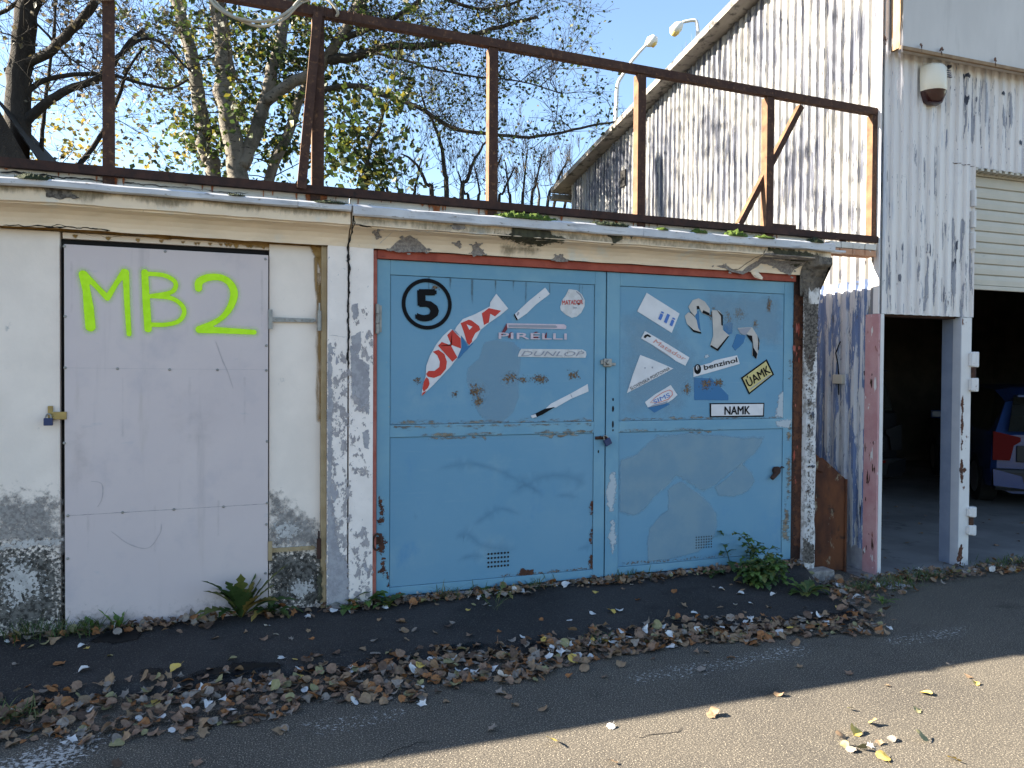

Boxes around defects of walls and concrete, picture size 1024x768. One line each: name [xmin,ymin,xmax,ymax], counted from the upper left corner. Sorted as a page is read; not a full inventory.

spalling [372,229,432,255]
crack [333,216,496,366]
spalling [712,253,816,280]
peeling [793,219,973,561]
leakage [0,494,65,635]
leakage [268,493,323,609]
peeling [326,303,374,609]
rust [377,496,390,587]
rust [814,454,848,572]